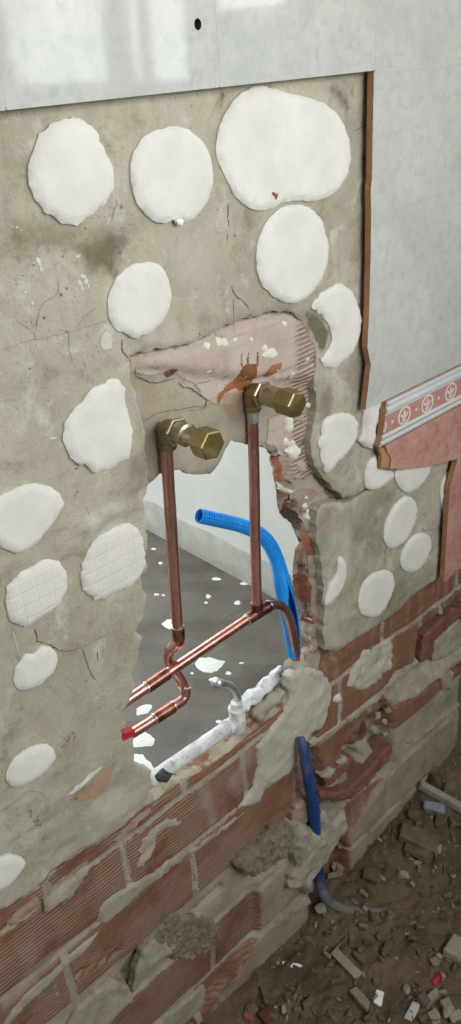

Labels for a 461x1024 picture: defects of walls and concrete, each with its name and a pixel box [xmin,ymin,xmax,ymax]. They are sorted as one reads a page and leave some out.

crack [6,283,105,358]
corrosion [218,352,282,404]
spalling [128,312,336,555]
spalling [292,573,317,624]
crack [35,630,109,680]
spalling [414,605,461,662]
spalling [69,763,116,800]
spalling [286,734,393,823]
flaking render [373,990,384,1006]